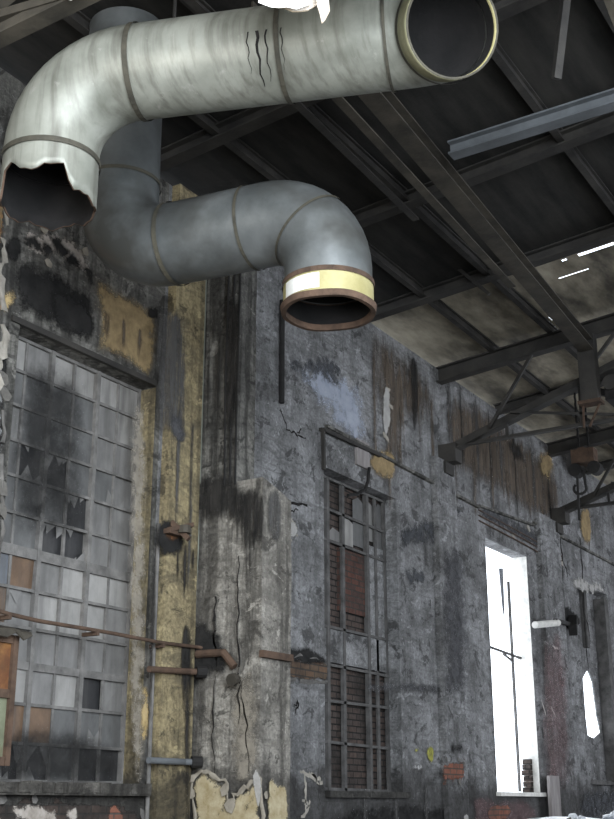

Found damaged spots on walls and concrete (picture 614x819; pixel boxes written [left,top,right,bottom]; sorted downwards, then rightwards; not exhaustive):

peeling [258,0,330,24]
spalling [0,206,15,312]
spalling [0,324,12,547]
damp [448,383,499,443]
damp [454,430,558,524]
damp [269,491,281,539]
damp [401,520,434,547]
crack [236,556,248,747]
crack [210,596,218,773]
spalling [0,795,145,819]
peeling [190,769,288,819]